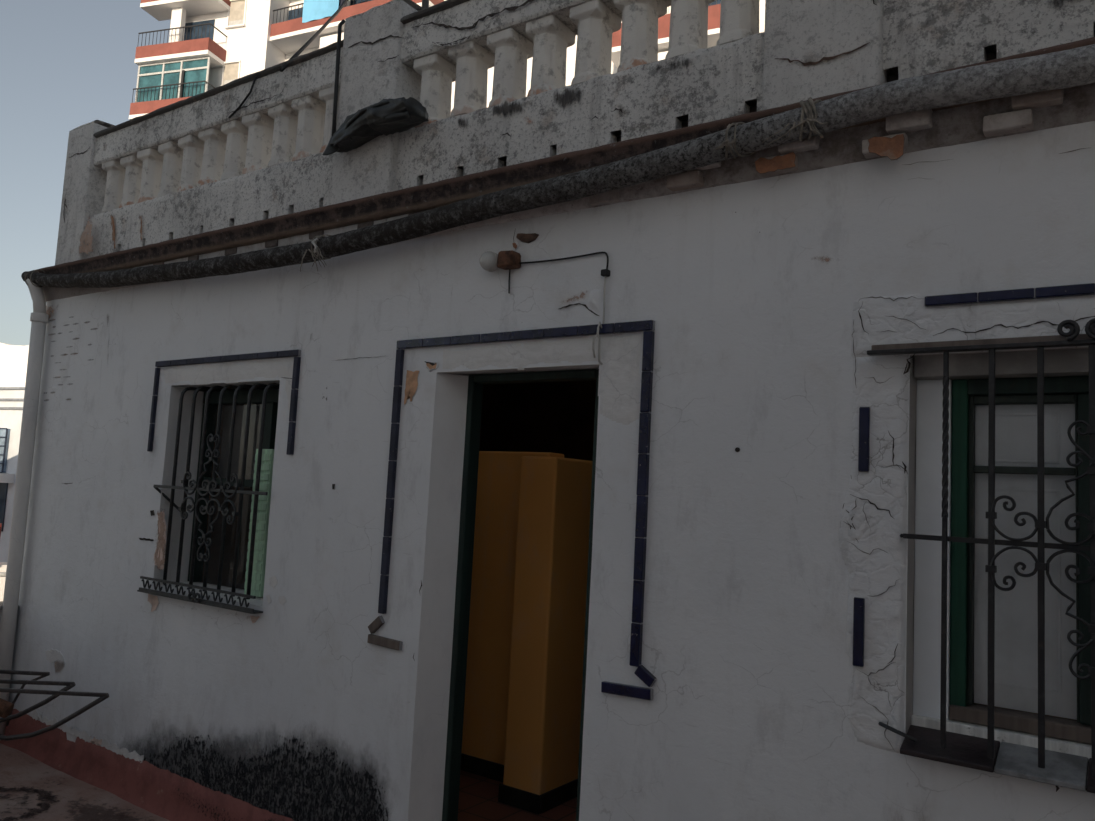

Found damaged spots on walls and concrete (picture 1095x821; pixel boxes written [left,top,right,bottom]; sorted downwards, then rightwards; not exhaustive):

crack [348,0,534,62]
crack [775,42,870,66]
crack [852,296,1095,388]
peeling [404,361,439,405]
crack [886,431,908,474]
spalling [139,510,167,571]
crack [840,477,893,555]
crack [857,644,898,750]
leakage [132,735,388,821]